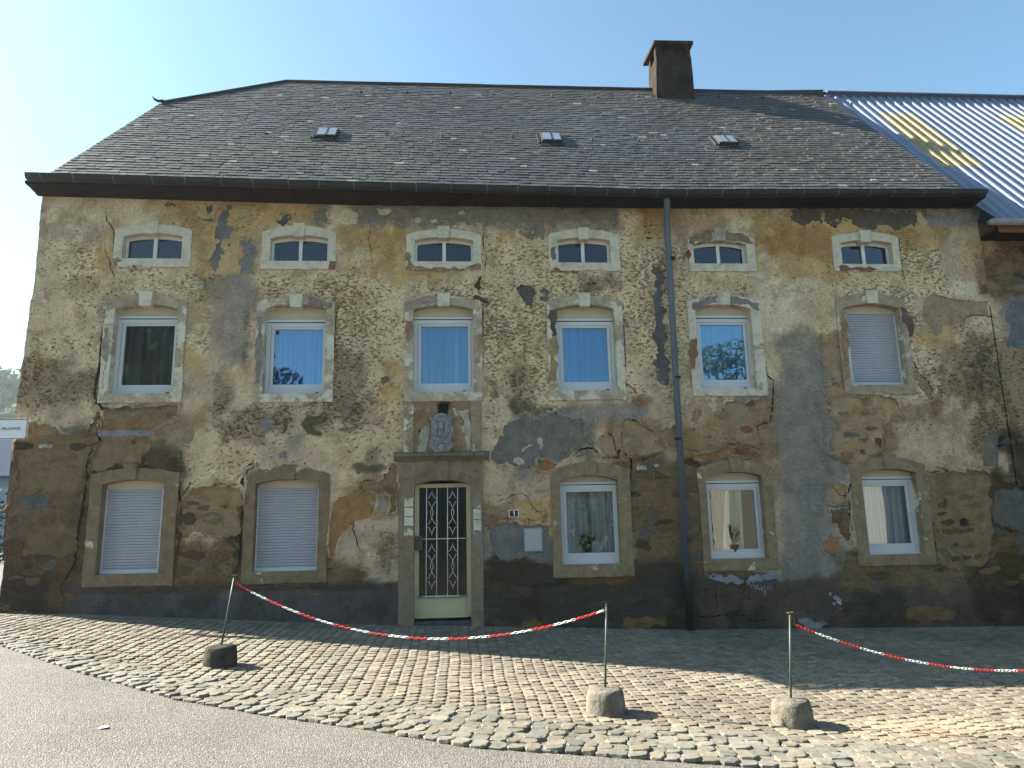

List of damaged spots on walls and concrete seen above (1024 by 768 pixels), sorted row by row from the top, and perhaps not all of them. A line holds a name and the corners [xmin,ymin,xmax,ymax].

crack [104,215,115,280]
peeling [203,202,261,285]
peeling [789,206,981,235]
peeling [513,281,559,382]
peeling [648,264,672,389]
crack [60,332,105,610]
flaking render [326,461,400,560]
crack [576,419,651,484]
peeling [488,396,775,474]
water stain [776,328,834,573]
flaking render [926,465,1024,572]